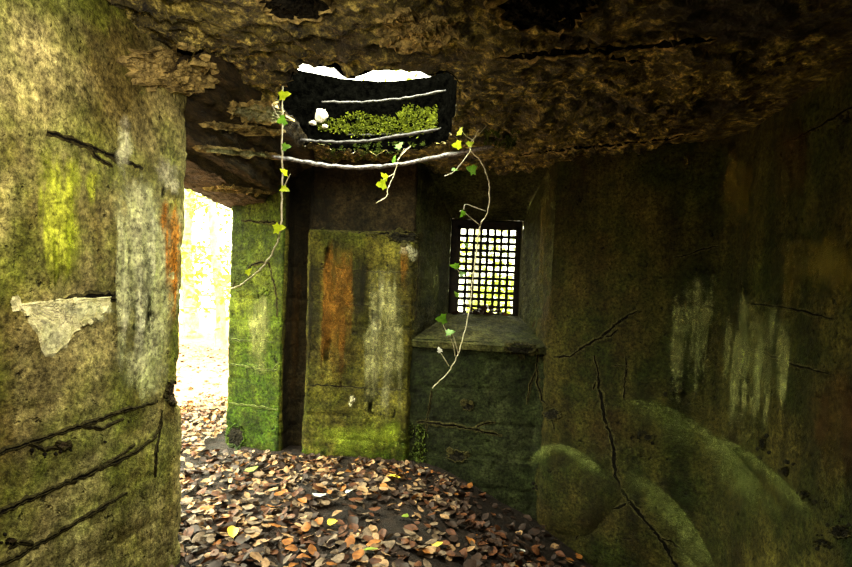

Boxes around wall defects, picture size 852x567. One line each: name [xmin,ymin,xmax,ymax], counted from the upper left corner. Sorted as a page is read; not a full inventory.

rust [161,203,180,300]
peeling [10,296,111,357]
leakage [672,284,711,376]
leakage [724,306,788,409]
crack [0,400,163,517]
crack [516,310,682,567]
crack [0,491,128,567]